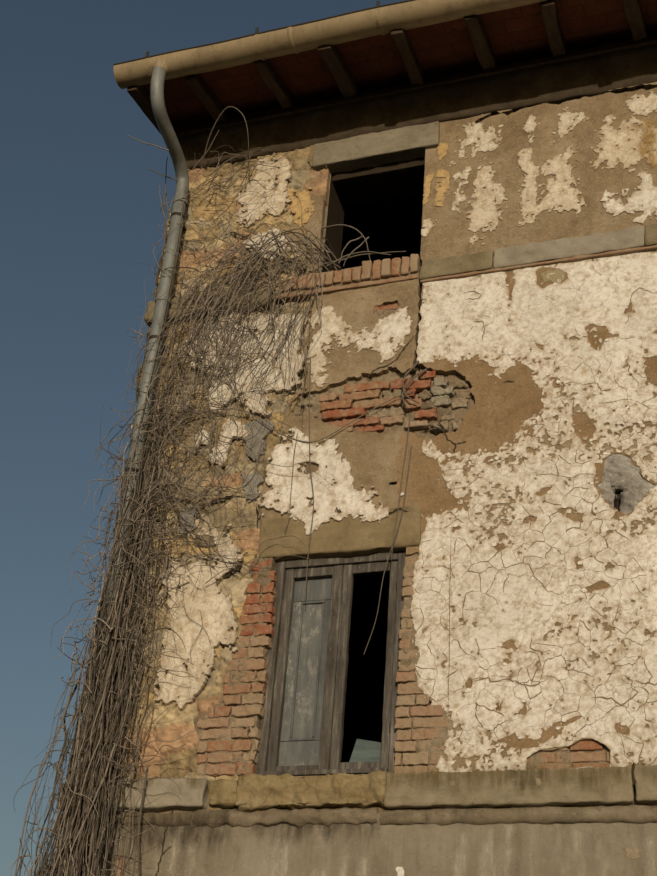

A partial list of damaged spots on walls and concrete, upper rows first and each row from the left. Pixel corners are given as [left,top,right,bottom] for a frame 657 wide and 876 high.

flaking render [236,153,315,261]
flaking render [421,114,587,245]
flaking render [551,107,589,144]
flaking render [590,91,657,224]
flaking render [585,324,619,350]
flaking render [634,350,657,399]
flaking render [571,410,657,518]
flaking render [182,303,563,774]
crack [413,265,657,786]
spalling [154,524,277,777]
spalling [497,716,610,770]
crack [155,809,173,876]